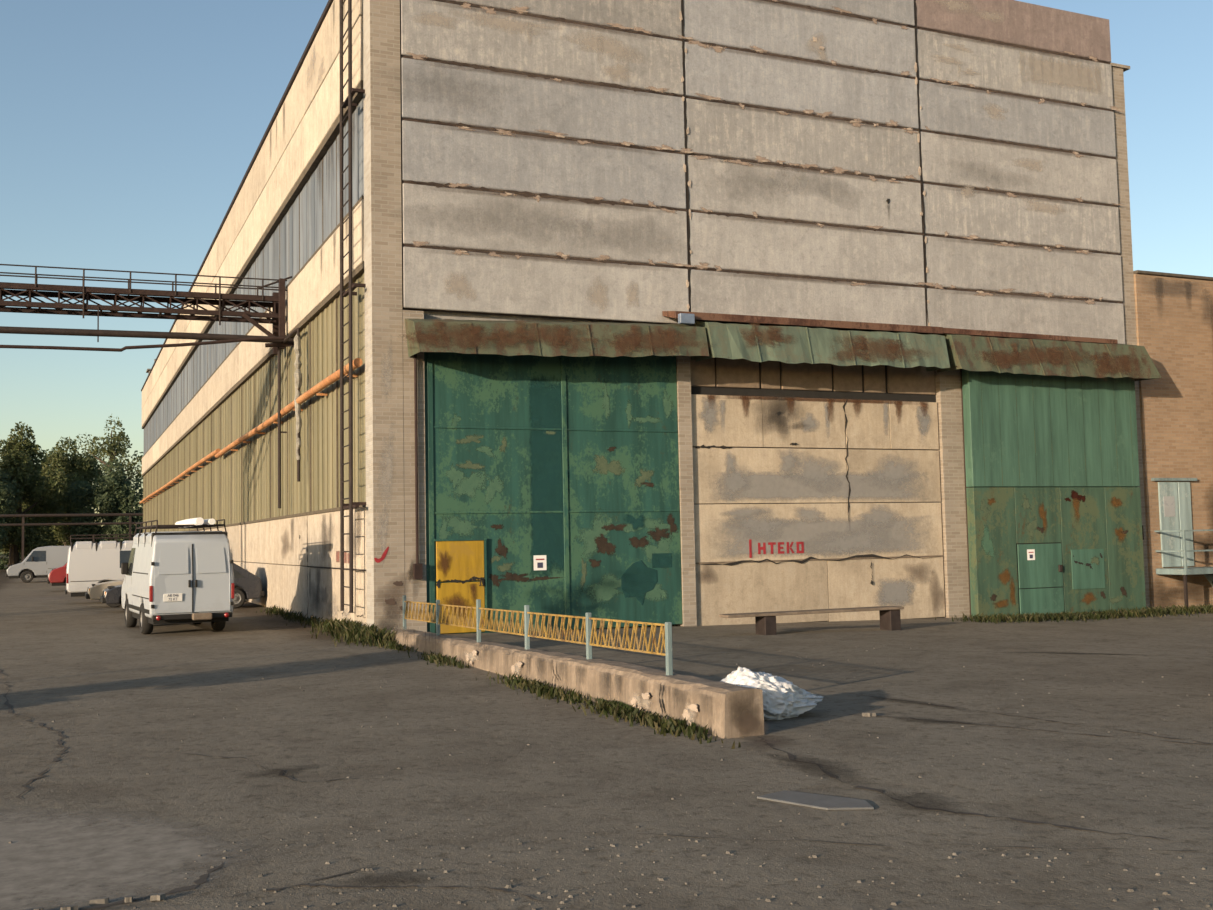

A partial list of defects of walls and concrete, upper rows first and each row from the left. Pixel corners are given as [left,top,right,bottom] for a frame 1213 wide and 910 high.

corrosion [837,336,919,362]
crack [843,394,851,519]
corrosion [1065,490,1086,517]
crack [695,552,939,585]
corrosion [990,570,1015,608]